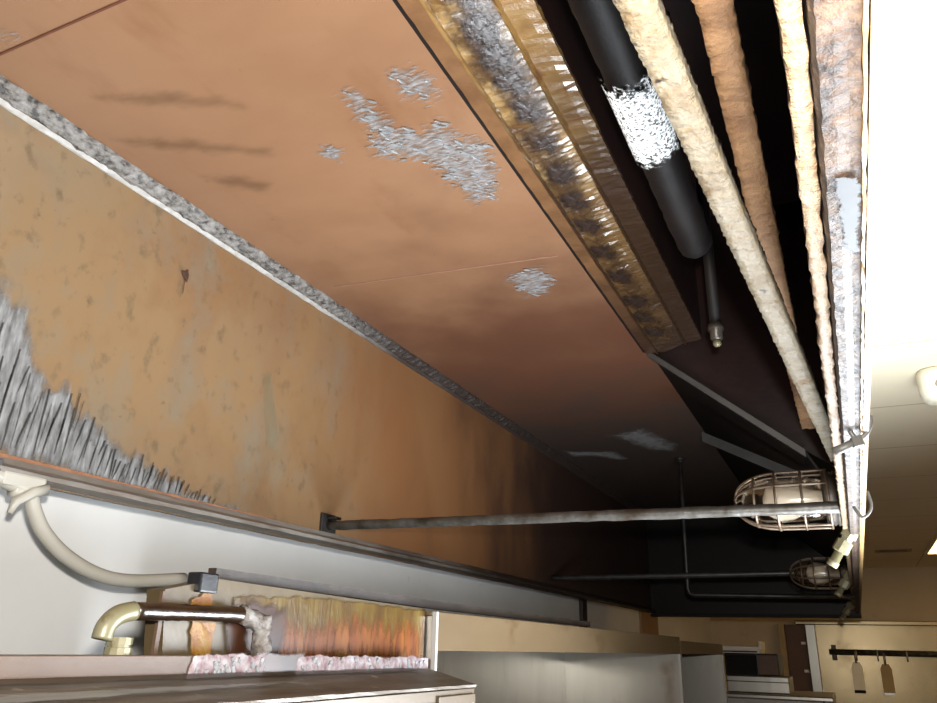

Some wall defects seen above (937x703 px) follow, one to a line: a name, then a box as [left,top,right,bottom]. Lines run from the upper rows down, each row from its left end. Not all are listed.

peeling [0,289,216,503]